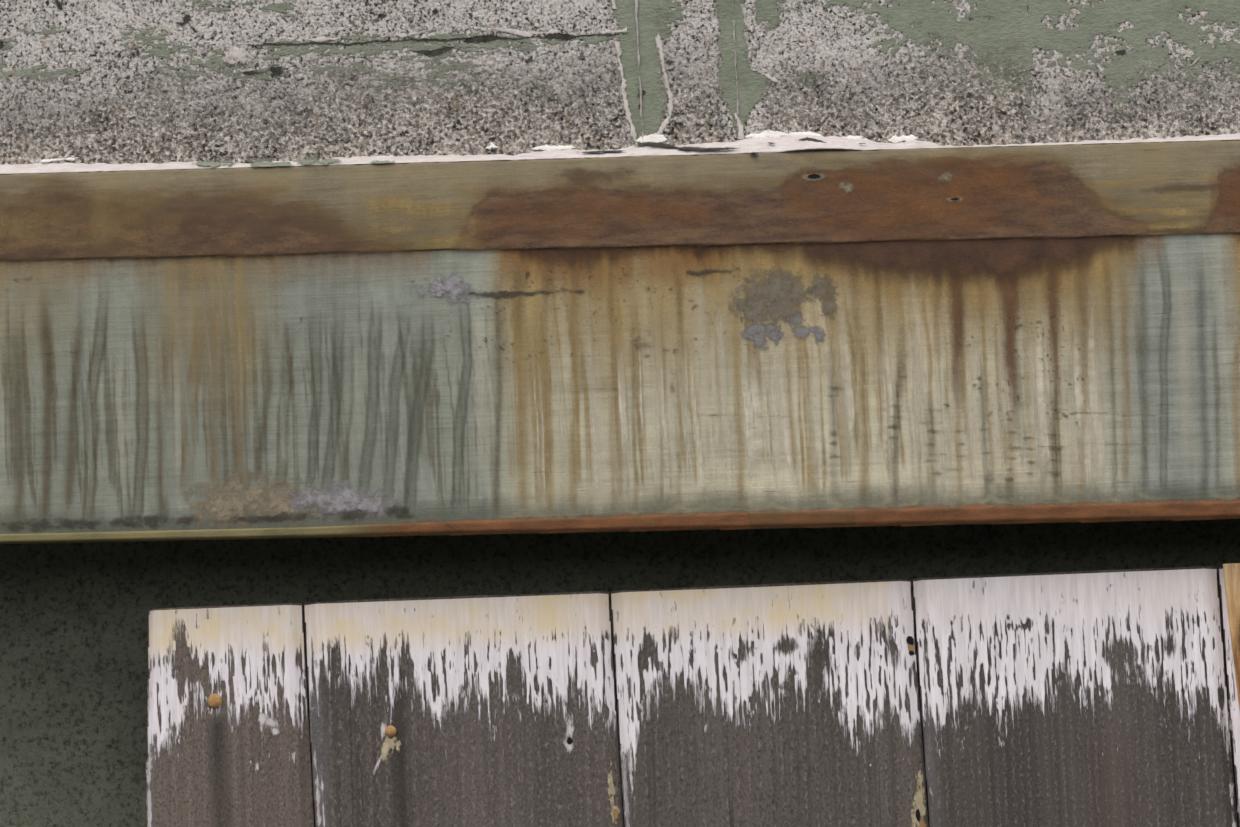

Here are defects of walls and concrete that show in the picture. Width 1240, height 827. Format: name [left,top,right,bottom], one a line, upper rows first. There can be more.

spalling [0,0,1240,165]
leakage [34,327,56,514]
leakage [67,342,105,508]
peeling [412,273,583,304]
peeling [731,270,838,350]
corrosion [455,159,1240,387]
leakage [497,243,1240,518]
peeling [148,569,1240,827]